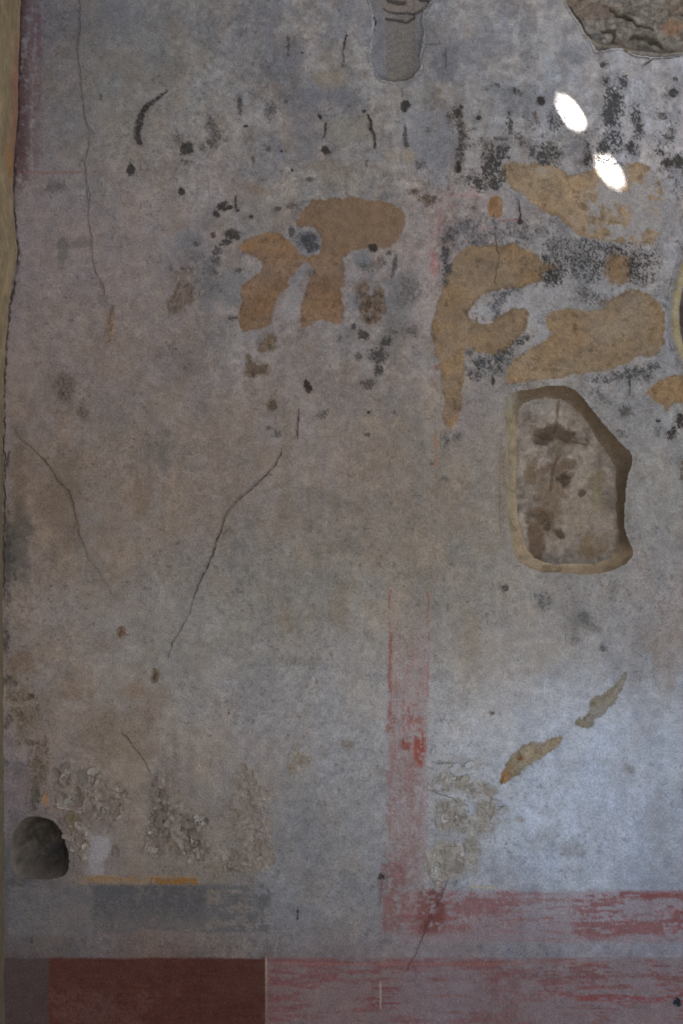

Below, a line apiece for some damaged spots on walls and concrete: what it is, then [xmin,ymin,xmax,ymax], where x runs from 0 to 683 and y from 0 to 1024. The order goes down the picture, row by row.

flaking render [361,0,440,90]
spalling [559,0,683,64]
leakage [444,81,566,195]
leakage [581,59,683,177]
crack [2,0,113,599]
leakage [165,194,254,298]
leakage [356,216,673,309]
leakage [335,322,421,391]
crack [168,447,283,658]
flaking render [573,670,629,729]
flaking render [419,735,564,889]
crack [407,881,448,971]